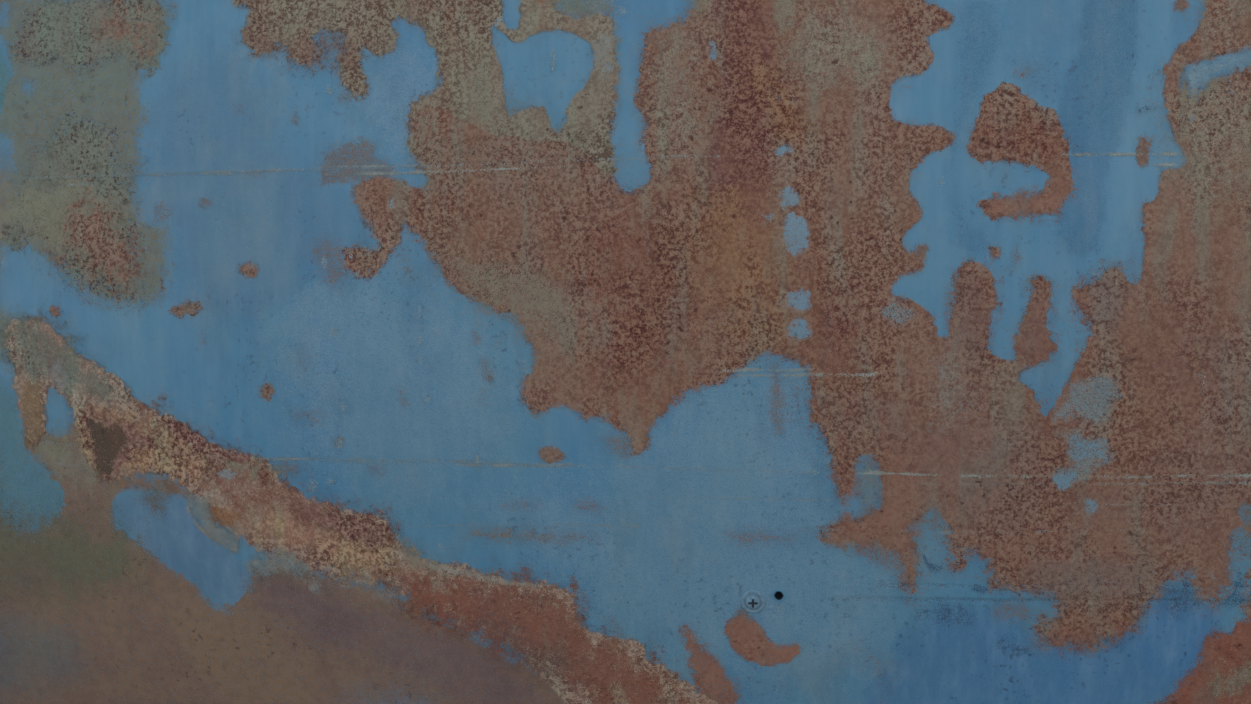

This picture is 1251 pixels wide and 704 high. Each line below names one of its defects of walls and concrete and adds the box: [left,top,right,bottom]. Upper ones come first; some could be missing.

rust [4,0,179,80]
rust [962,66,1083,226]
rust [0,100,802,704]